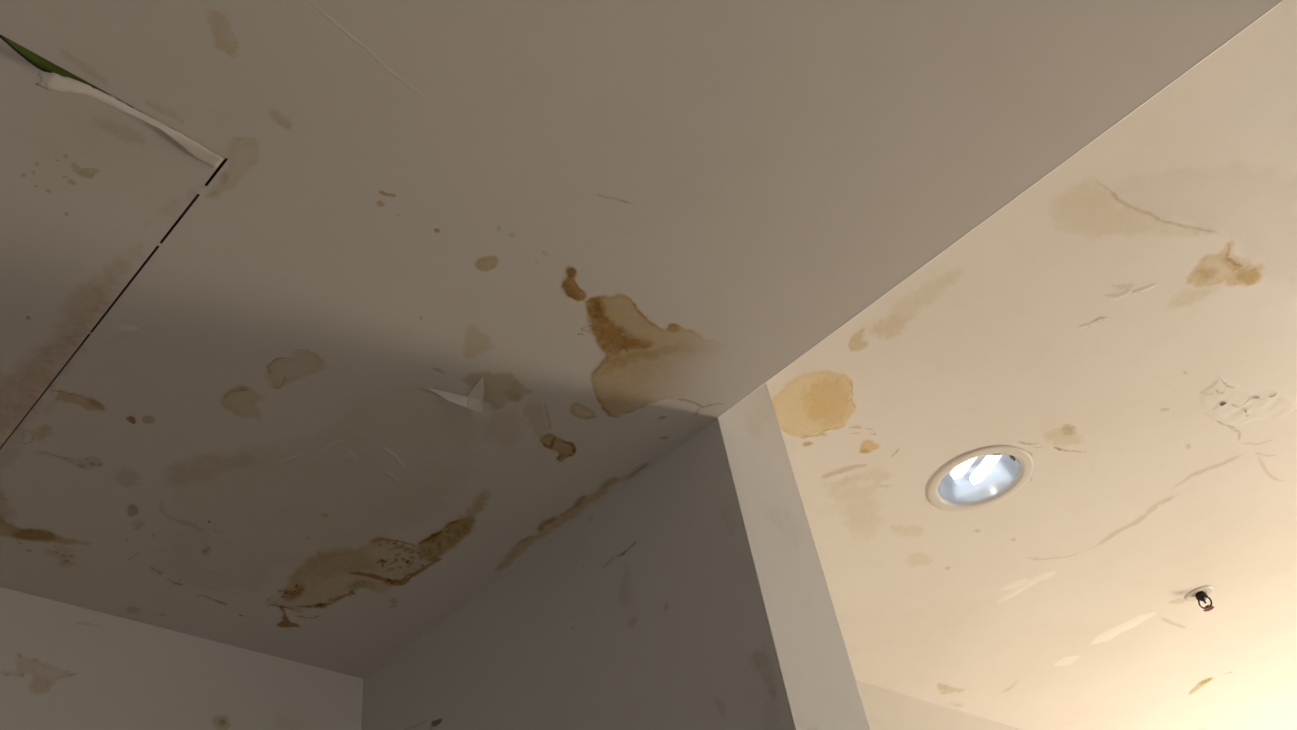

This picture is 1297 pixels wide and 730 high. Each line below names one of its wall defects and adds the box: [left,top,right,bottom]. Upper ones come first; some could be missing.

peeling [430,377,484,413]